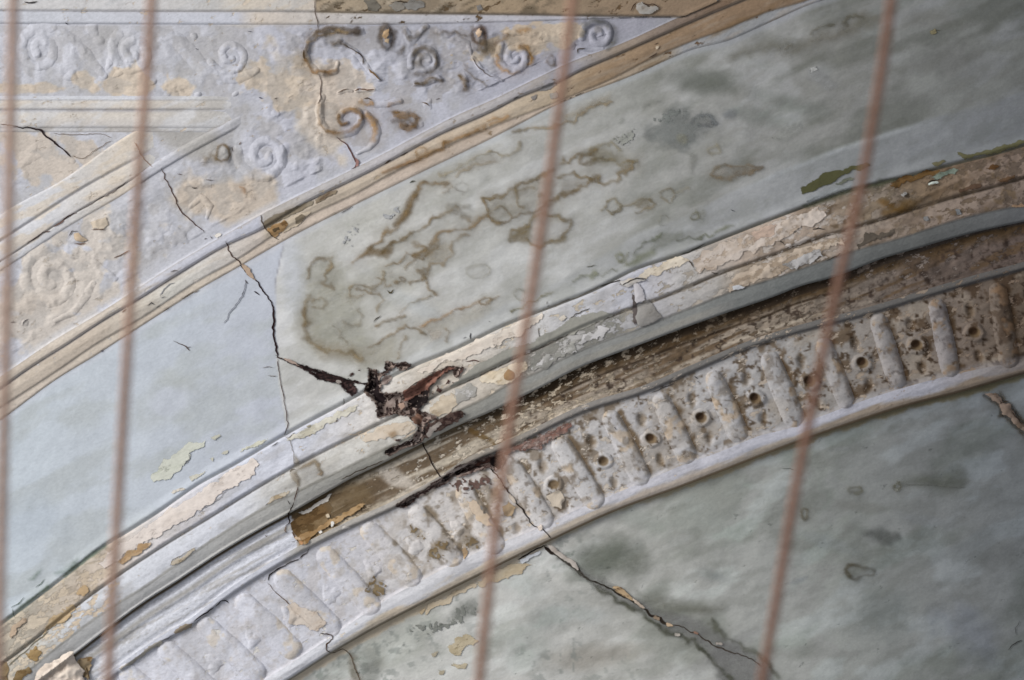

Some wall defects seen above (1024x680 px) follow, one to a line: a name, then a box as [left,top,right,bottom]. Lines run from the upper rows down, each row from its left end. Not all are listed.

peeling [69,217,108,245]
crack [2,124,367,459]
damp [364,169,466,297]
damp [469,130,634,245]
damp [648,108,730,148]
spalling [349,308,616,457]
peeling [98,405,357,569]
crack [491,469,760,665]
peeling [119,623,192,669]